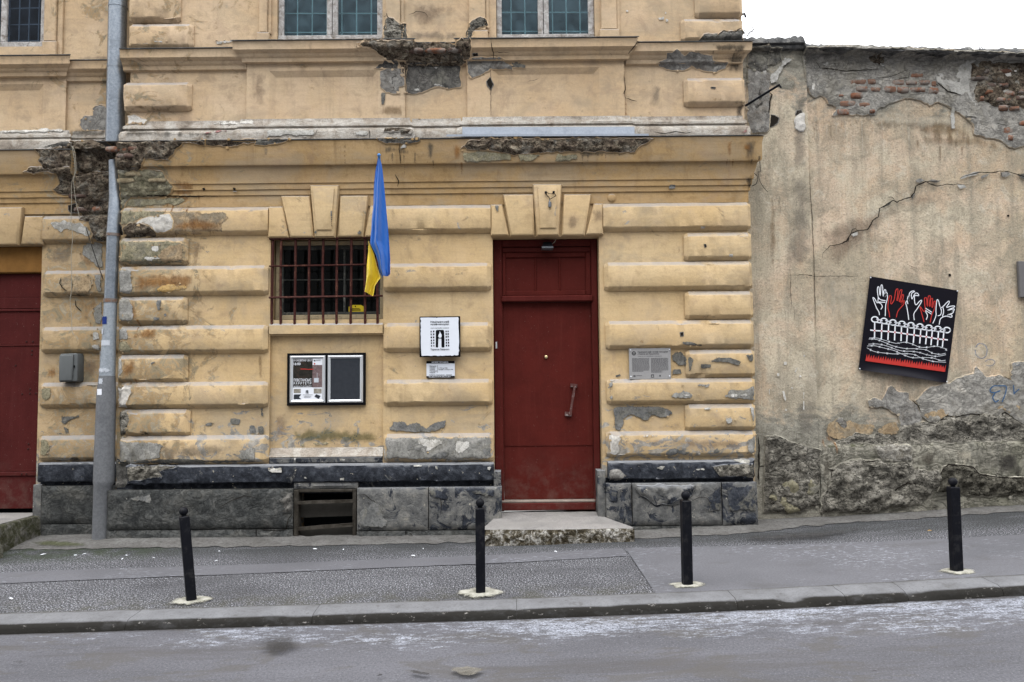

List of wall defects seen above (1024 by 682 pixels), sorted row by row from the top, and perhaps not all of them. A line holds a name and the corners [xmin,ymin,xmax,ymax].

flaking render [356,16,526,104]
flaking render [657,29,1024,149]
flaking render [460,136,655,163]
flaking render [2,104,314,350]
crack [790,171,1024,325]
peeling [385,421,492,470]
peeling [657,448,701,470]
peeling [608,342,753,455]
flaking render [696,361,1024,514]